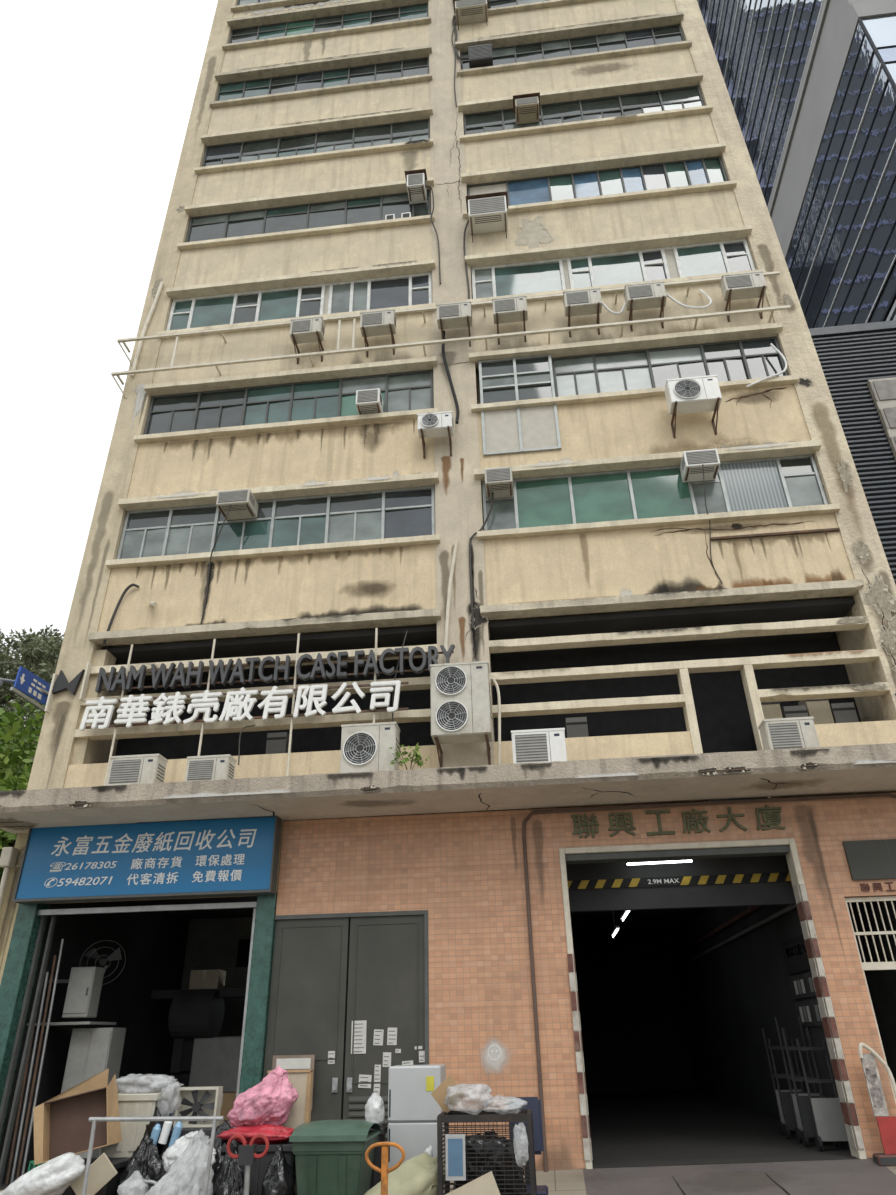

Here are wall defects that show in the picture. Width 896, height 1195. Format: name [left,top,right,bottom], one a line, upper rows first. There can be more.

corrosion [442,456,464,488]
water stain [647,581,726,594]
corrosion [734,574,845,588]
spalling [836,542,896,656]
spalling [851,682,896,698]